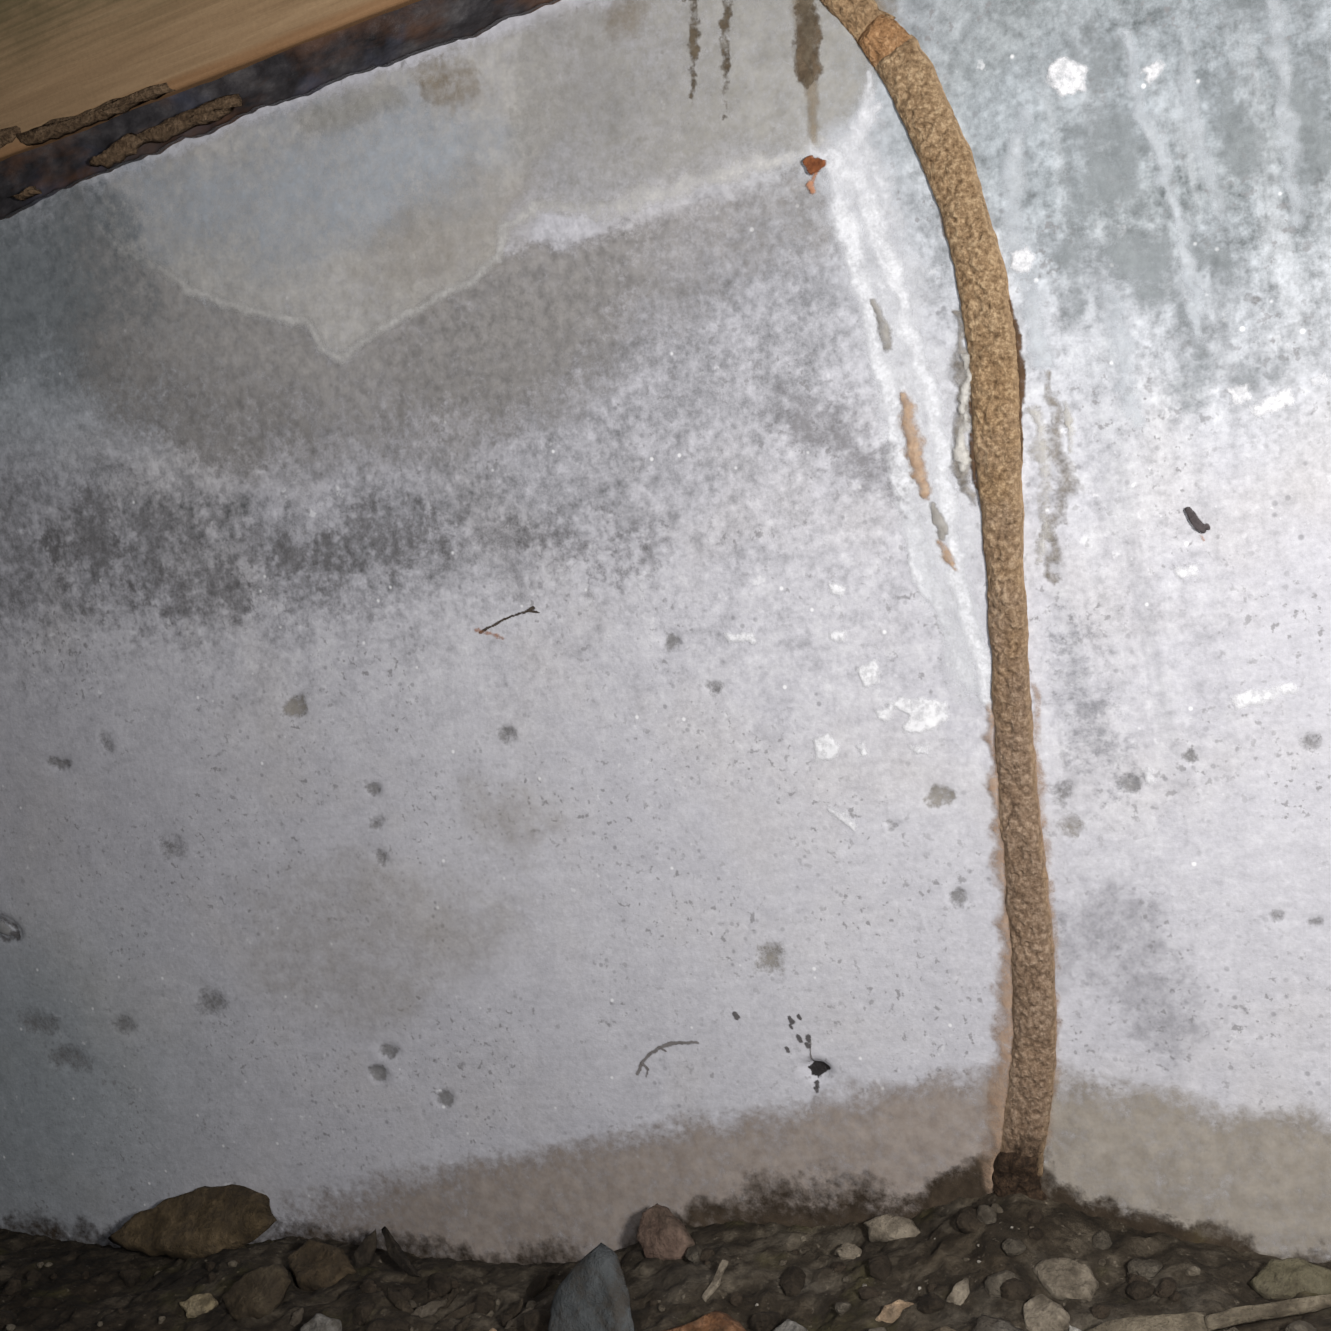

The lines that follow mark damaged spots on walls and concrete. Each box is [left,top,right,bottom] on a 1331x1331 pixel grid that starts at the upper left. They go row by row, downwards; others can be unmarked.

corrosion [802,155,827,194]
water stain [1062,30,1231,334]
water stain [1270,50,1331,221]
water stain [0,0,993,710]
water stain [311,1074,1008,1265]
water stain [1043,1079,1331,1263]